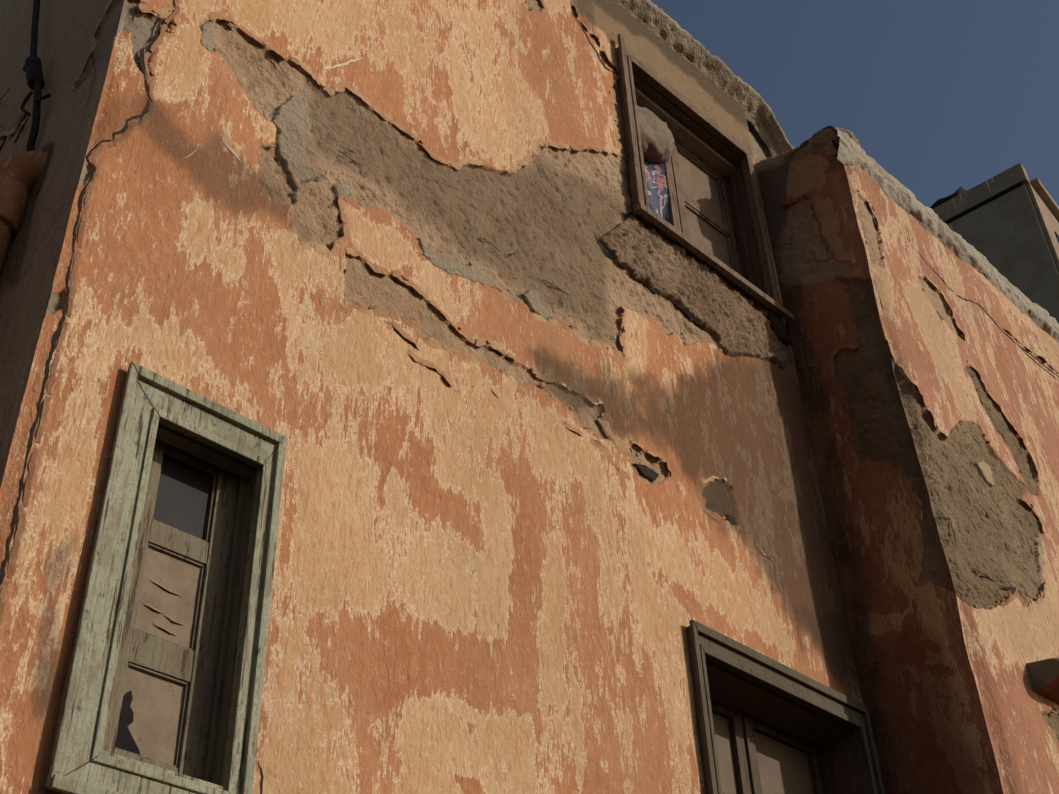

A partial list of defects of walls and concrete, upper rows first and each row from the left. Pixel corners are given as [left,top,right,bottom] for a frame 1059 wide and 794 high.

crack [0,0,180,624]
peeling [71,0,177,91]
peeling [199,11,752,477]
peeling [694,476,737,526]
peeling [828,189,1047,612]
crack [902,233,1059,381]